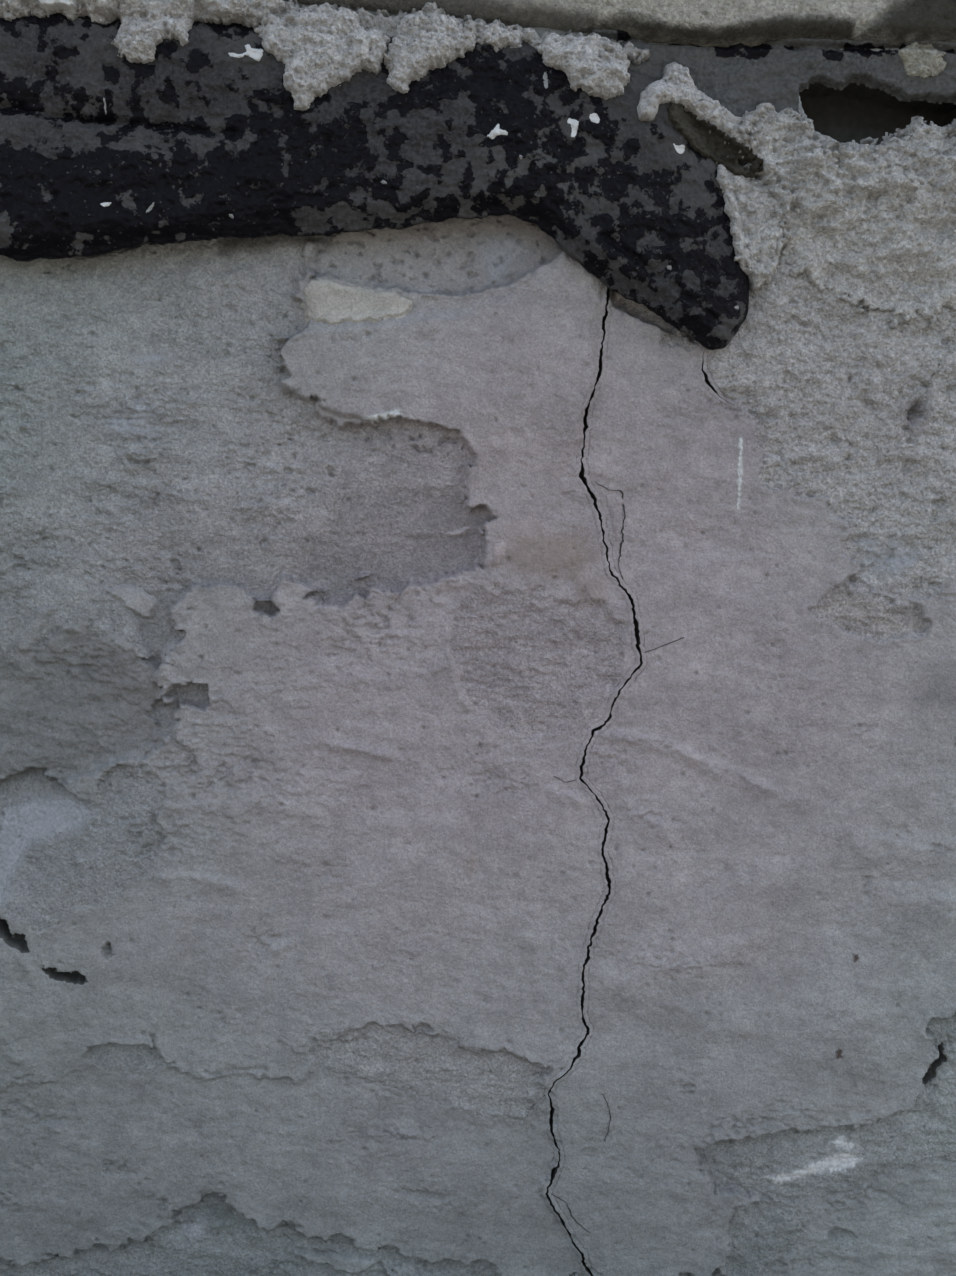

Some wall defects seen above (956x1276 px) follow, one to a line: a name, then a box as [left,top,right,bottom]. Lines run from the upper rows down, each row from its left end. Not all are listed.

spalling [38,0,79,14]
spalling [790,117,886,151]
spalling [0,234,507,667]
crack [697,348,737,411]
spalling [599,247,956,644]
spalling [445,583,629,740]
spalling [0,763,167,932]
crack [530,285,684,1276]
spalling [83,1043,167,1078]
spalling [308,1022,553,1120]
spalling [694,1013,956,1276]
spalling [0,1191,501,1276]